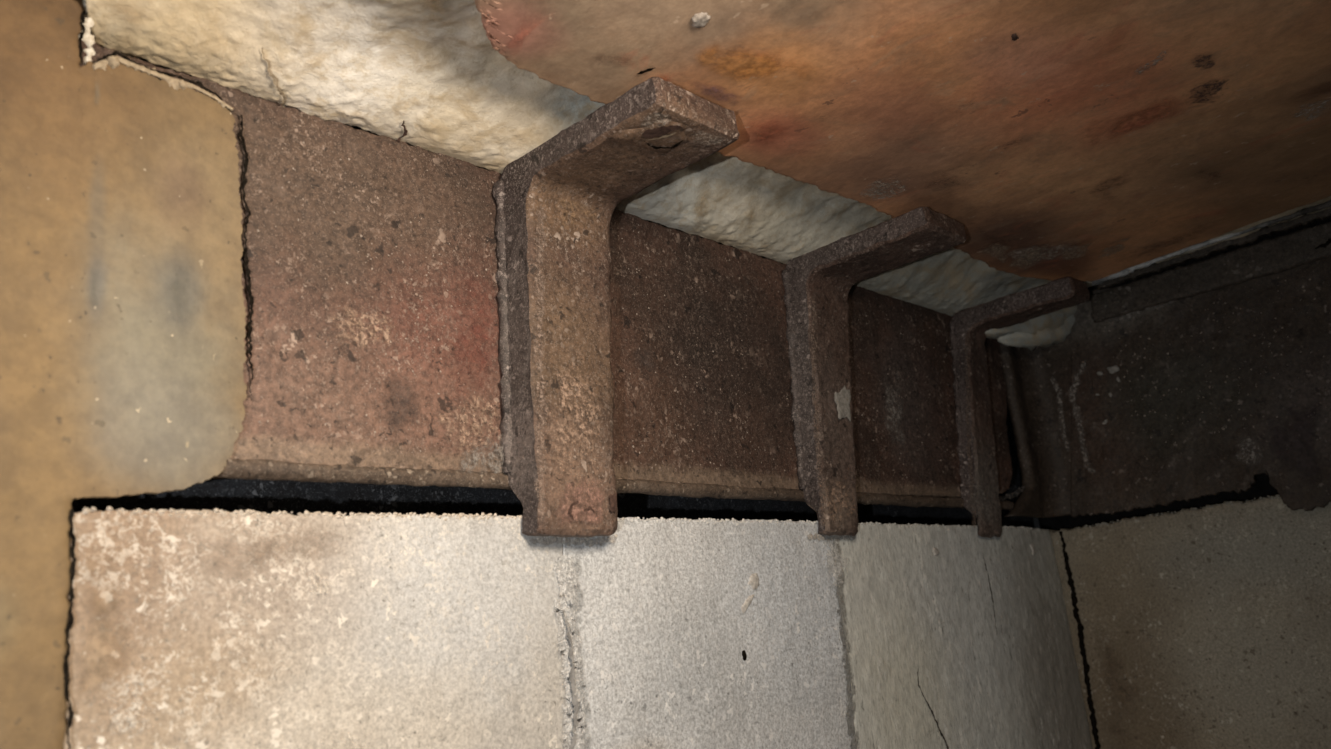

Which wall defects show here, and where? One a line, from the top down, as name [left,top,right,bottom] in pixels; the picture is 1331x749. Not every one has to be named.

crack [79,1,254,401]
rust [561,484,604,522]